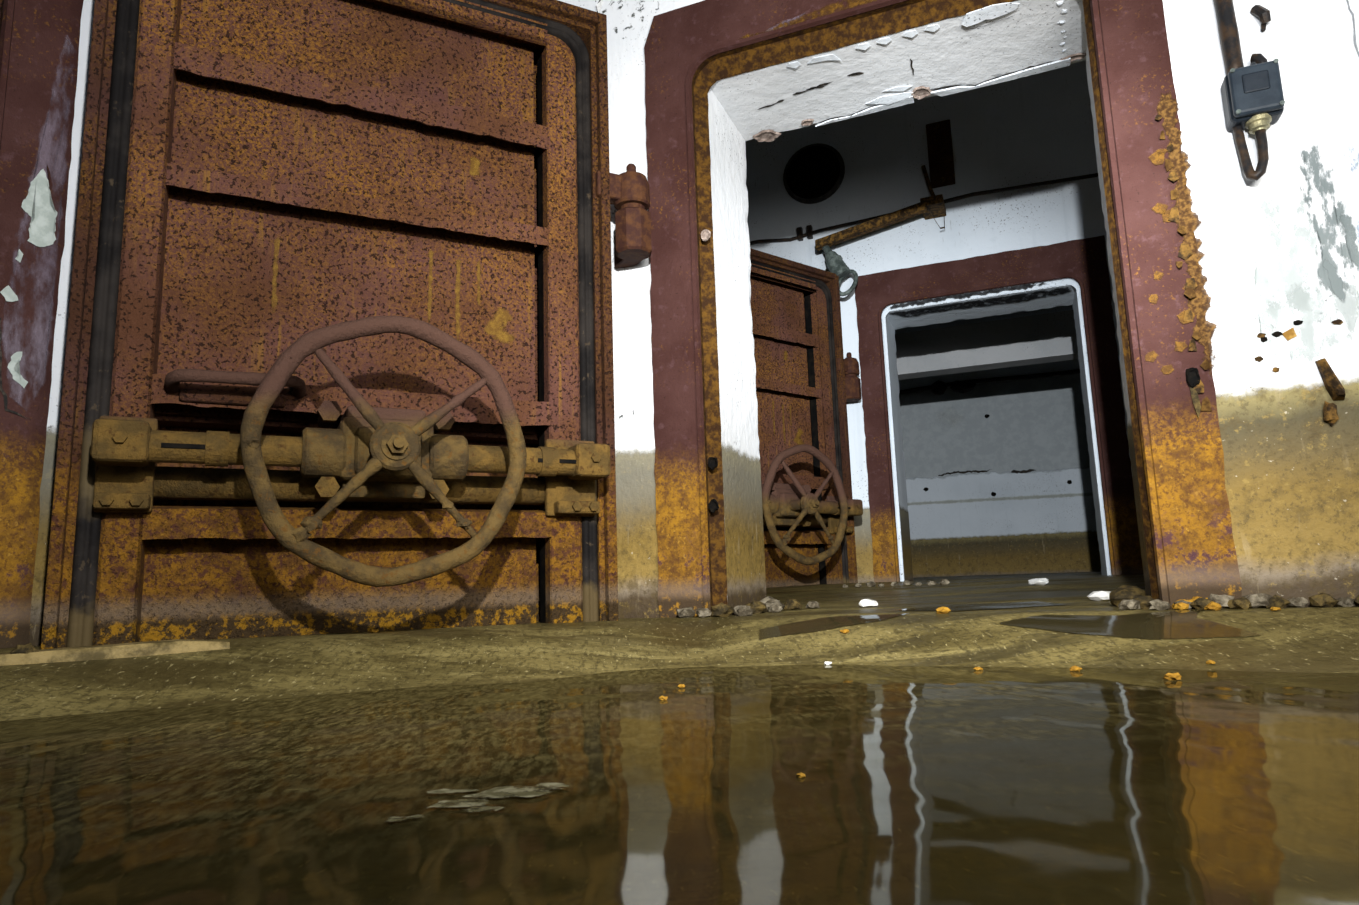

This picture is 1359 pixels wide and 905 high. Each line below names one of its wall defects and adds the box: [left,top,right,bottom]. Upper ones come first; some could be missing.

corrosion [743,0,873,38]
crack [1346,0,1359,56]
peeling [0,103,70,418]
corrosion [815,165,946,251]
corrosion [1145,91,1217,411]
water stain [1253,145,1359,361]
water stain [1216,379,1359,607]